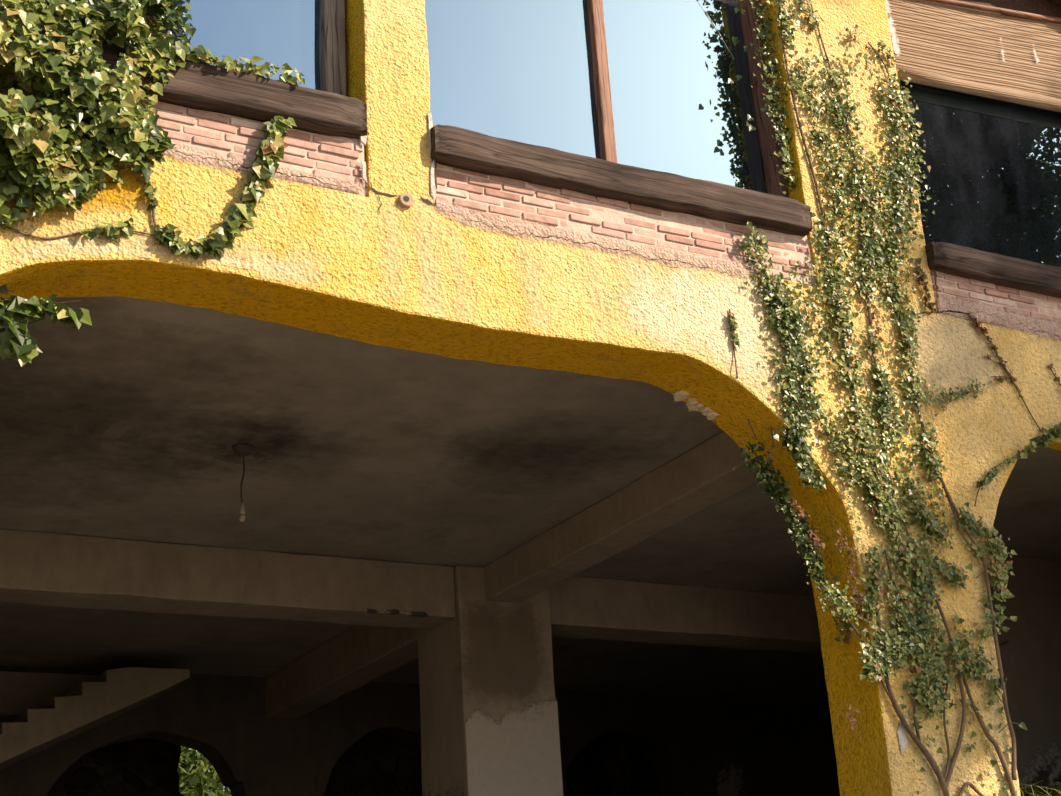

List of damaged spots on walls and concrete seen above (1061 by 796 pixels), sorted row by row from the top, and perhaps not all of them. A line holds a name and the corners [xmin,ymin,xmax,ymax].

spalling [672,390,719,420]